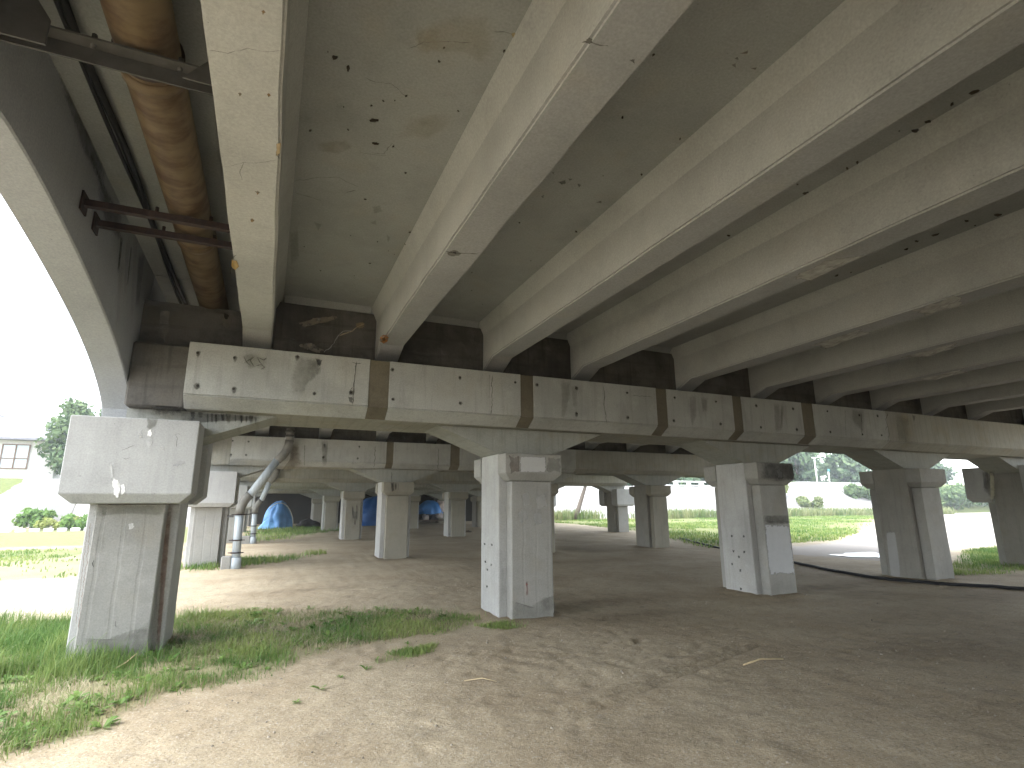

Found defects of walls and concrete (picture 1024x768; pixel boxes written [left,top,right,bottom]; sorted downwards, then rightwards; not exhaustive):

crack [349,362,360,404]